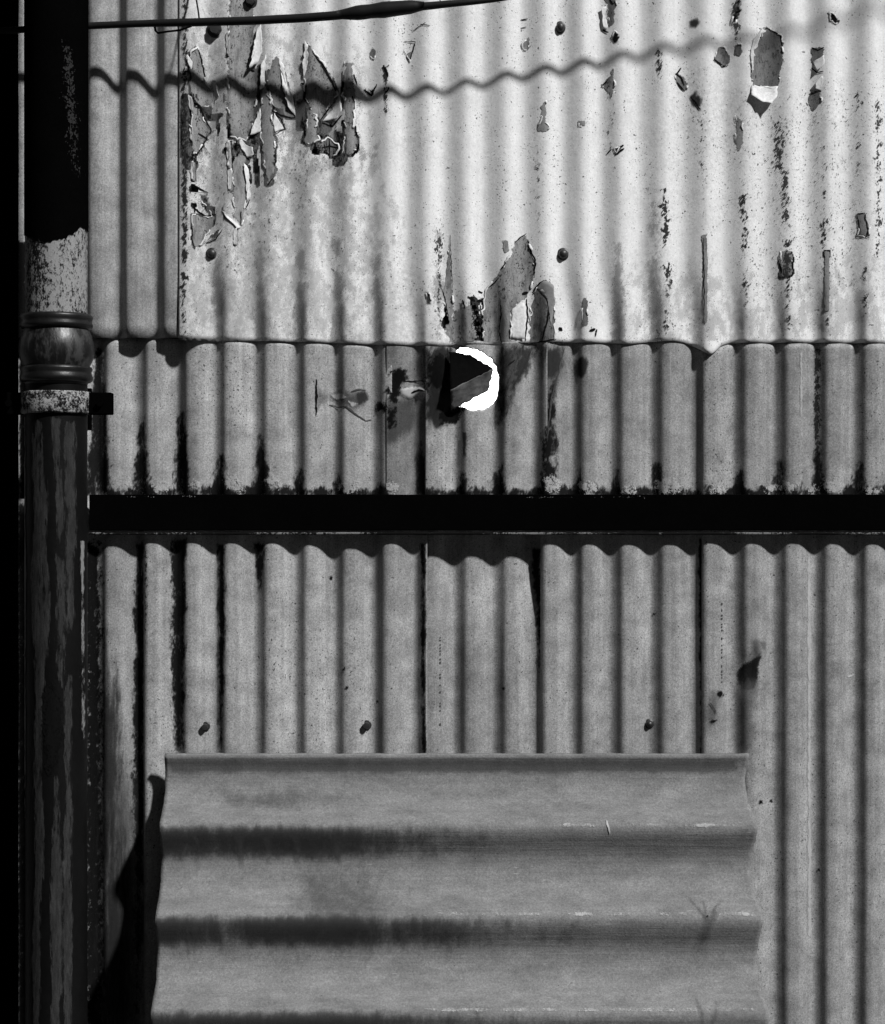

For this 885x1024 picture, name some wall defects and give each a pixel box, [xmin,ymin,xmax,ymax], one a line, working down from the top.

peeling [601,0,620,42]
peeling [714,26,785,103]
peeling [806,47,825,111]
peeling [187,0,390,247]
peeling [855,213,871,238]
peeling [425,234,563,344]
peeling [580,298,597,336]
peeling [778,249,793,276]